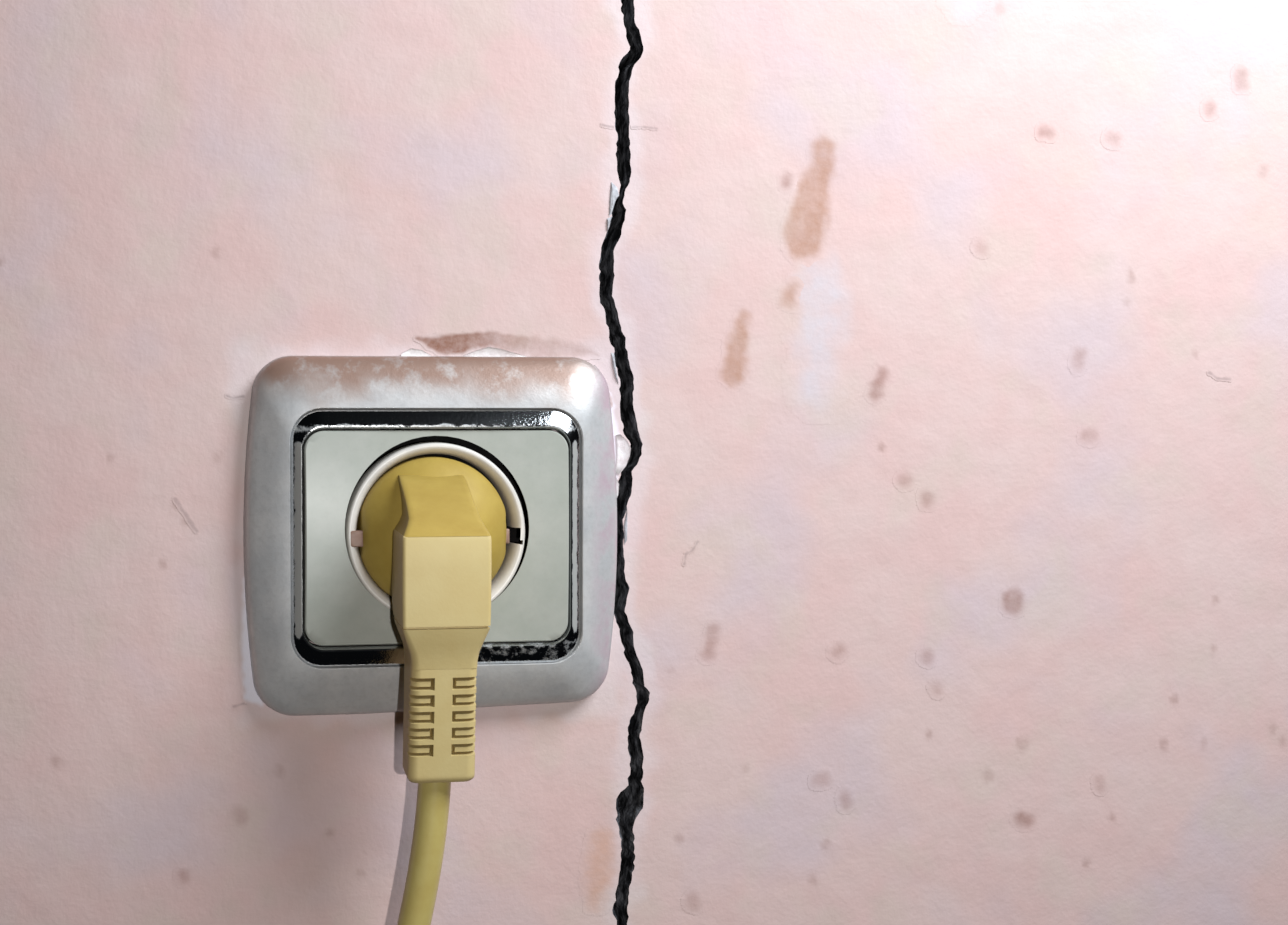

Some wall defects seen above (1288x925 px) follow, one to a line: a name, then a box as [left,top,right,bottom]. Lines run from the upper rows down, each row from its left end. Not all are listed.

leakage [776,130,841,313]
leakage [716,306,756,393]
crack [599,0,659,925]